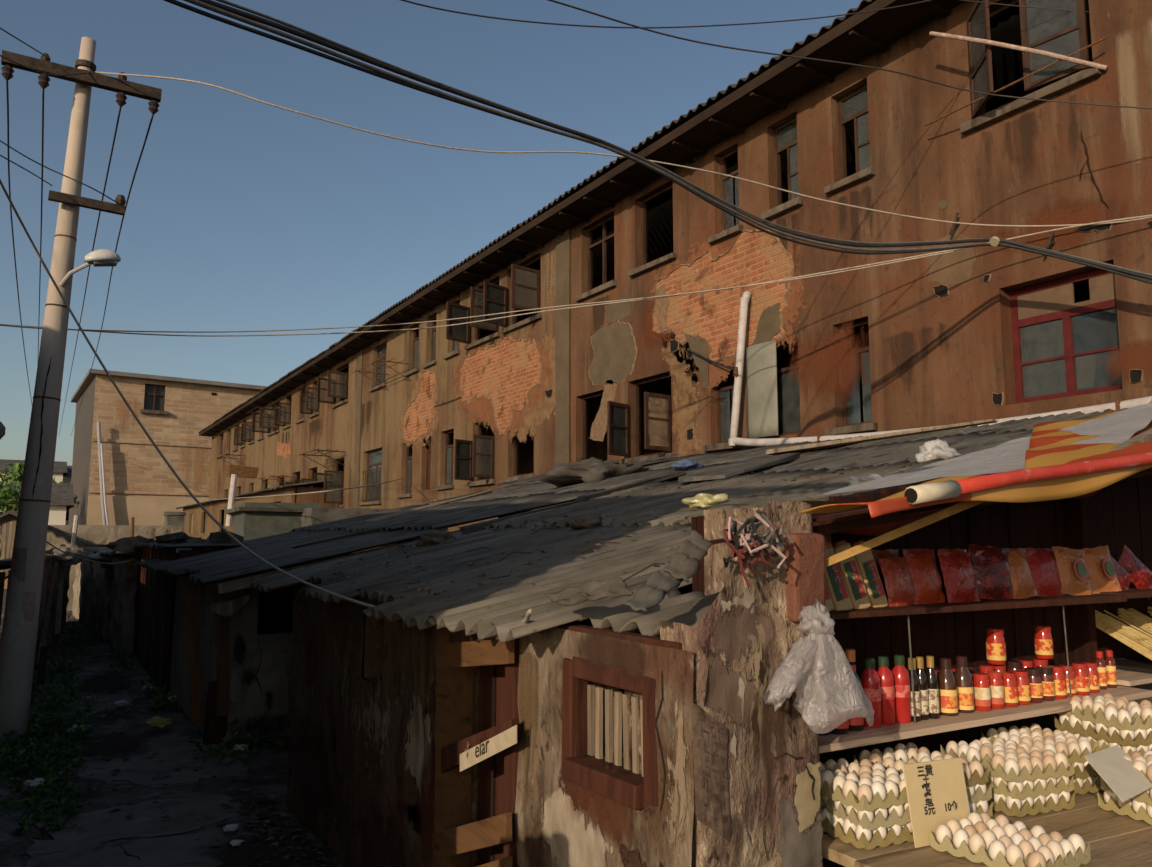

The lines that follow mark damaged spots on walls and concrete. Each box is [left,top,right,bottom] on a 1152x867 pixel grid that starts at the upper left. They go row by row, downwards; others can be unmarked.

crack [1079,130,1108,208]
flaking render [399,366,439,448]
flaking render [453,328,555,446]
flaking render [588,224,808,457]
flaking render [711,593,779,686]